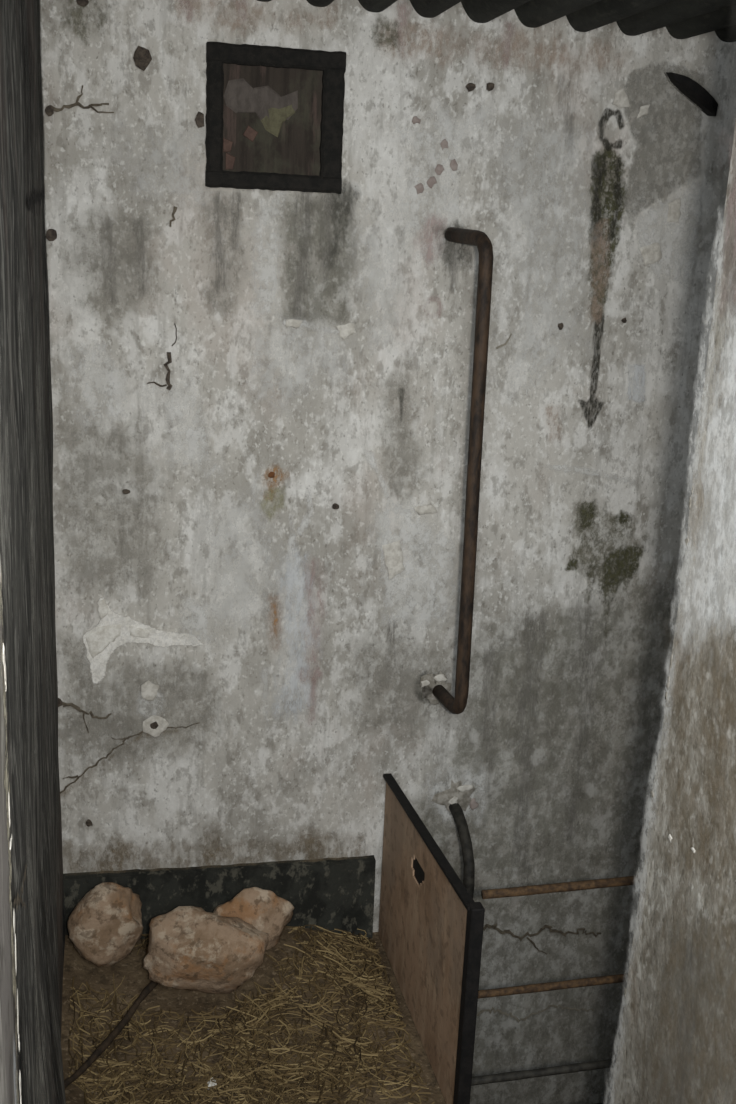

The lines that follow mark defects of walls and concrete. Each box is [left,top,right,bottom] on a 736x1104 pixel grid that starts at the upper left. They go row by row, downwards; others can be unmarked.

crack [45,85,114,116]
corrosion [262,466,283,515]
crack [58,698,199,794]
water stain [422,502,679,1104]
crack [483,924,601,955]